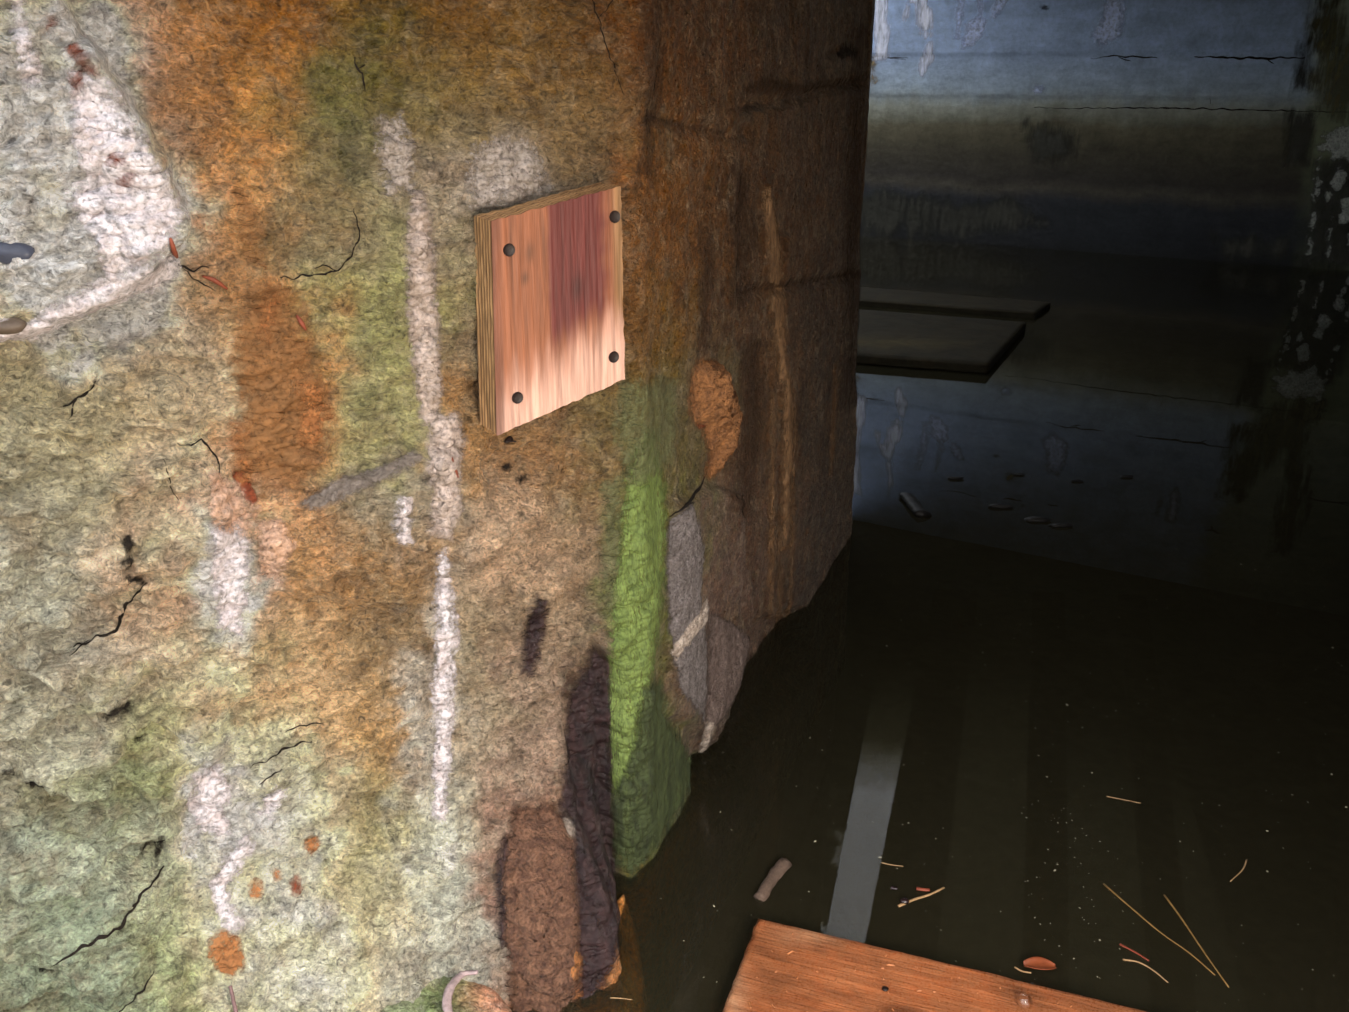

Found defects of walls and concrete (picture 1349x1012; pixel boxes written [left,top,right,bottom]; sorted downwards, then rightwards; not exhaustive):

leakage [873,0,890,60]
crack [280,208,360,280]
corrosion [231,284,331,505]
leakage [375,112,466,821]
leakage [208,473,296,634]
crack [69,583,147,656]
corrosion [305,836,320,854]
leakage [560,648,696,1008]
crack [53,866,165,966]
corrosion [250,870,301,898]
corrosion [208,930,244,976]
crack [119,971,154,1012]